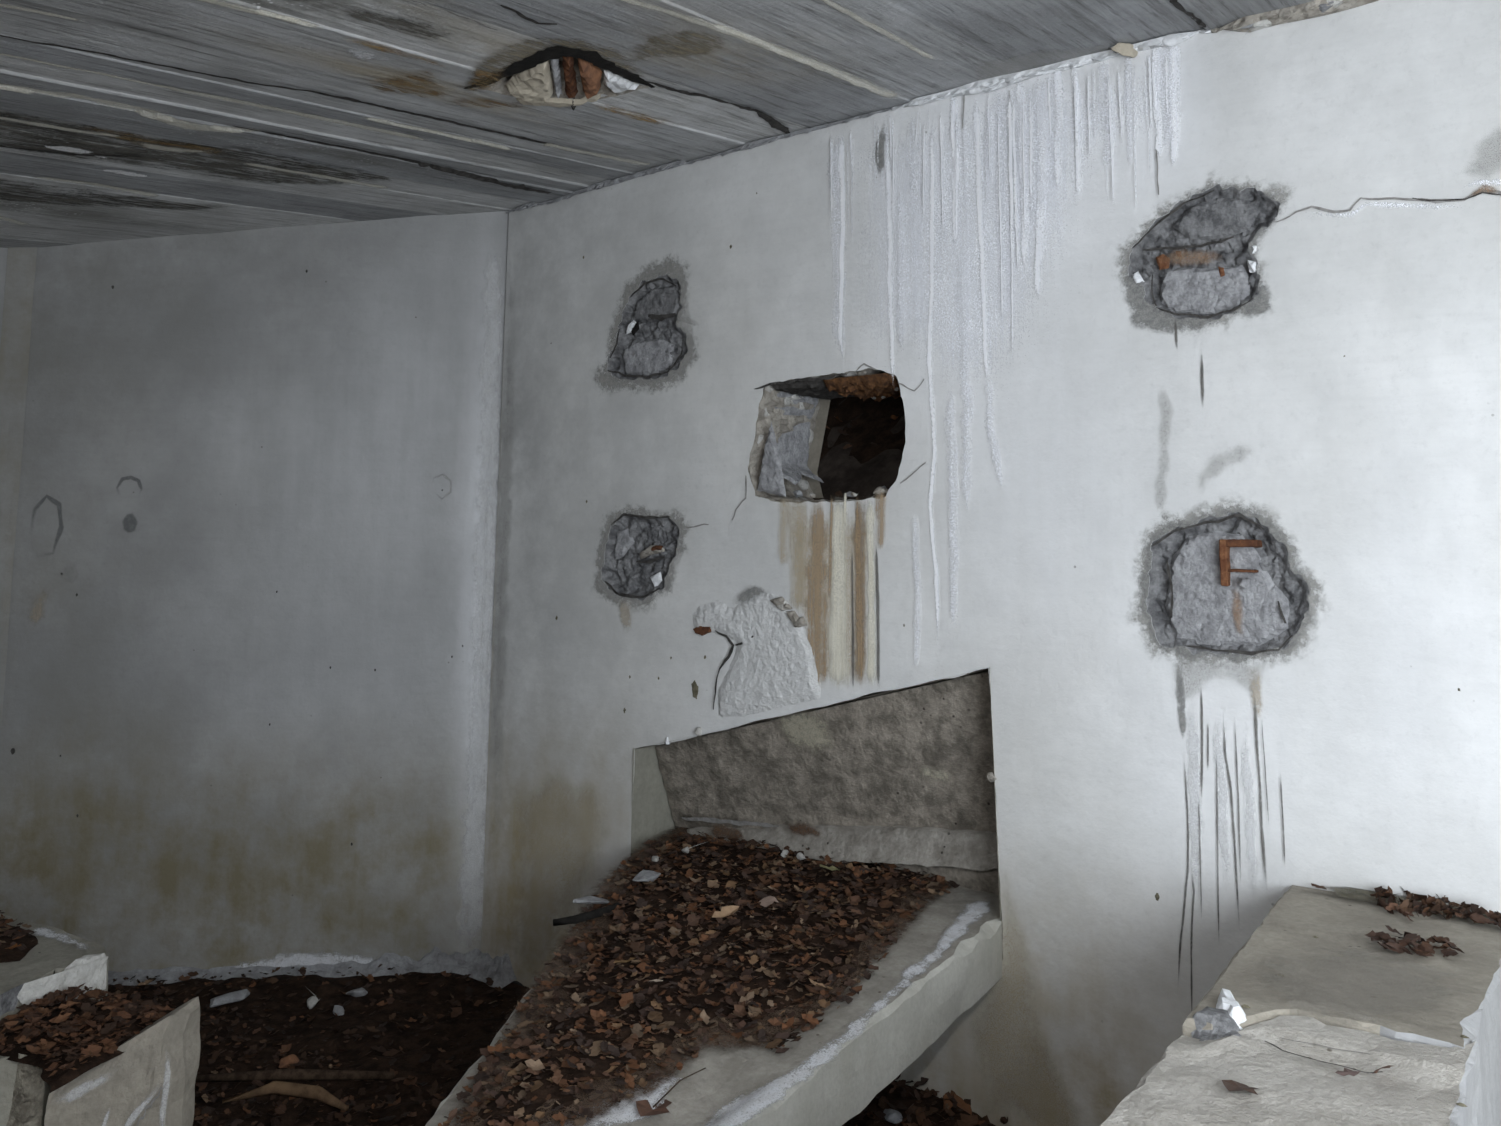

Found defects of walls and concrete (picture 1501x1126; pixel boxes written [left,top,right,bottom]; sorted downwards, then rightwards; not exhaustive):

water stain [0,84,388,225]
water stain [0,53,509,150]
water stain [348,11,450,39]
spalling [459,39,659,124]
water stain [621,0,1211,666]
flaking render [1119,181,1288,345]
crack [1276,179,1501,222]
spalling [732,363,926,520]
flaking render [596,509,709,625]
rust [780,493,885,683]
flaking render [1134,505,1321,664]
water stain [1177,668,1285,1008]